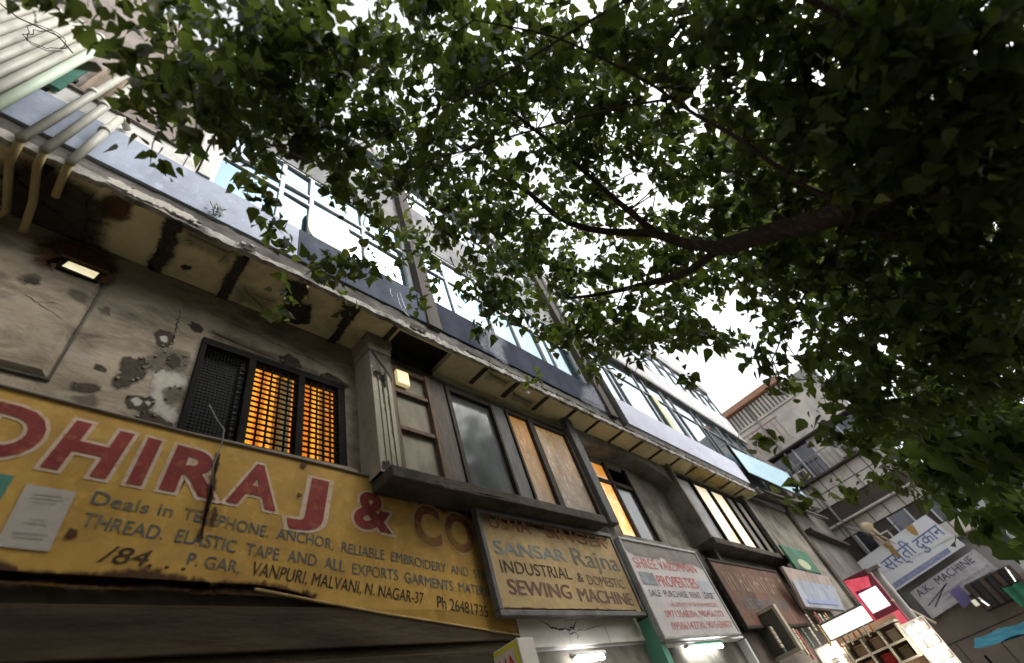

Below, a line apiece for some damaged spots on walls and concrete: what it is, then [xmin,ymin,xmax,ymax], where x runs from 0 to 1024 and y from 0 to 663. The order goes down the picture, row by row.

water stain [0,159,111,249]
water stain [147,218,192,273]
water stain [216,256,247,301]
peeling [94,330,189,427]